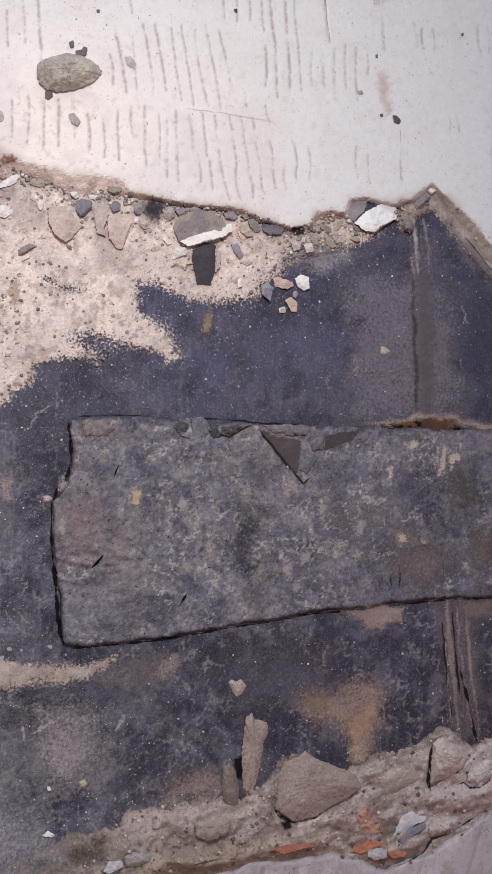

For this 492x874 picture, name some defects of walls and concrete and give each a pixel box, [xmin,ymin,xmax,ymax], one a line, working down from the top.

spalling [0,152,492,450]
peeling [264,424,326,475]
peeling [436,443,462,477]
peeling [42,476,68,503]
crack [50,414,364,649]
crack [388,565,492,606]
peeling [228,679,246,697]
peeling [0,694,125,874]
spalling [393,811,427,835]
spalling [368,848,387,860]